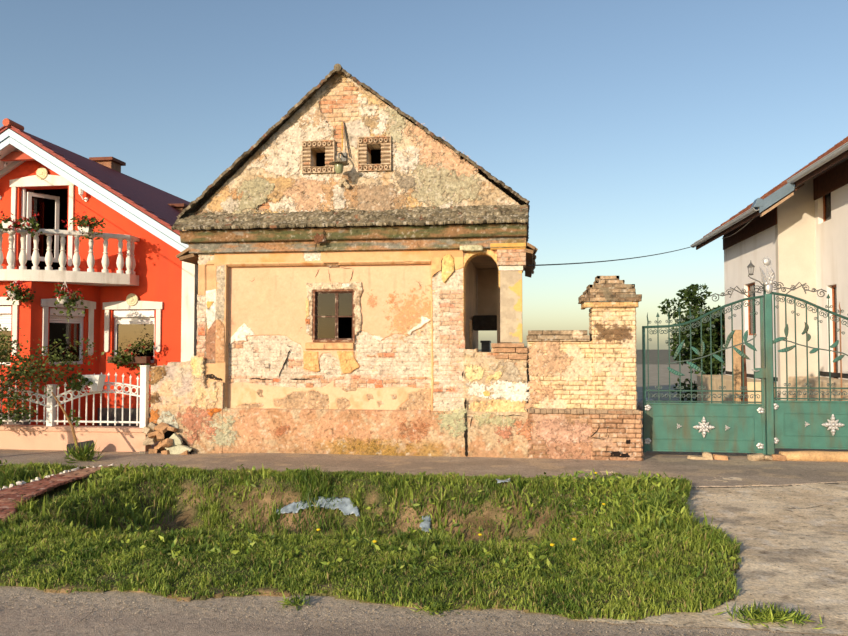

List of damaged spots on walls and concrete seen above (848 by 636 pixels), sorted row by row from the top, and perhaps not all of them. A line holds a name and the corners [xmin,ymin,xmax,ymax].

peeling [196,77,484,214]
spalling [189,253,530,412]